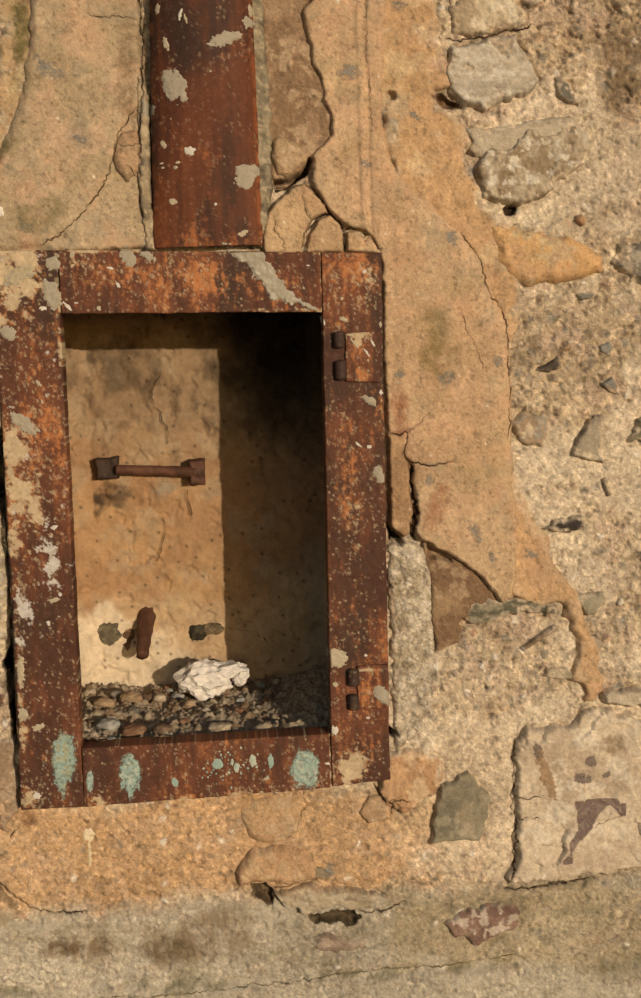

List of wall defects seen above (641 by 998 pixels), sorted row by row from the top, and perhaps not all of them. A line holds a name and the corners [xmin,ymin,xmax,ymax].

crack [43,0,144,245]
crack [463,235,512,435]
crack [390,416,451,538]
crack [0,883,83,914]